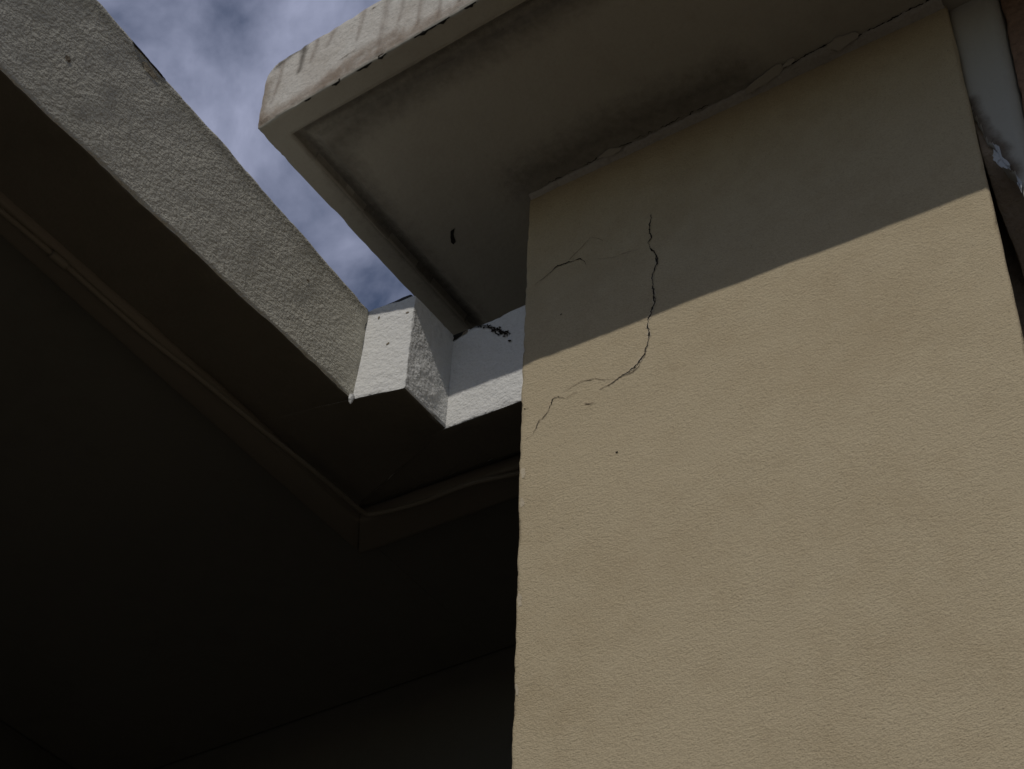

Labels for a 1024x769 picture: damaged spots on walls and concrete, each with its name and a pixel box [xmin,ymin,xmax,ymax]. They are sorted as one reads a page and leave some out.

flaking render [993,144,1022,192]
crack [526,216,659,439]